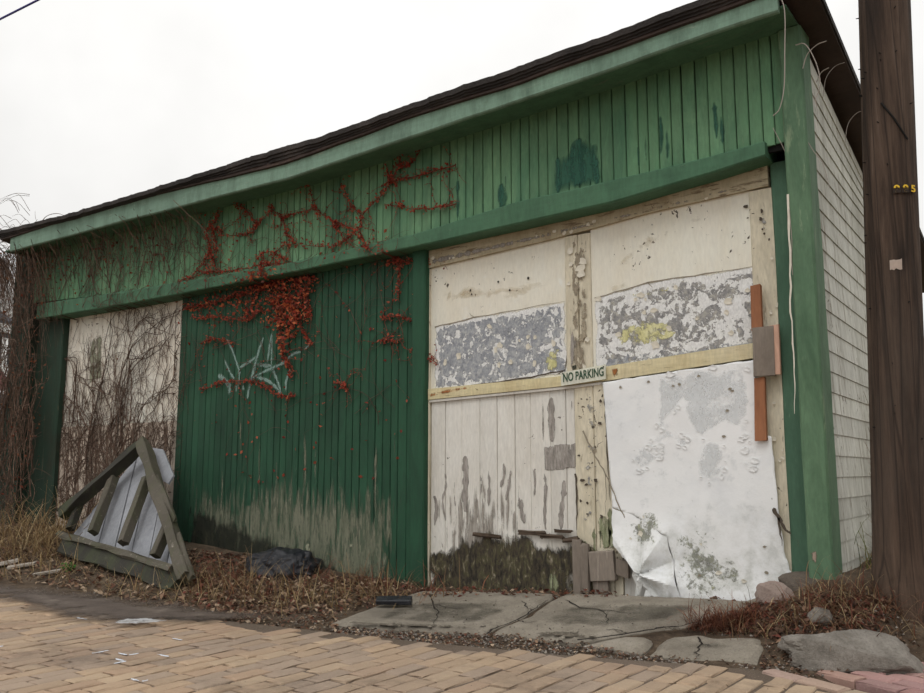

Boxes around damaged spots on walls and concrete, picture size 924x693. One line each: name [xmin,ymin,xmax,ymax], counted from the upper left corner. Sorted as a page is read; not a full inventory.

peeling [431,220,753,388]
damp [189,508,274,554]
crack [486,600,709,657]